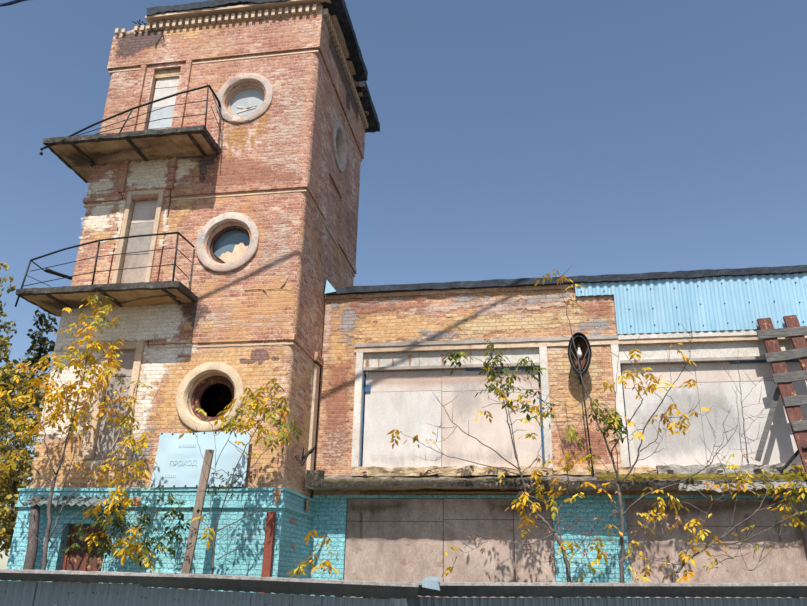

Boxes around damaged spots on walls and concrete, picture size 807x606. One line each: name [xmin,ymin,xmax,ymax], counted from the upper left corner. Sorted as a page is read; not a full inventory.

peeling [79,147,302,255]
damp [179,303,279,331]
peeling [32,303,288,505]
peeling [308,290,616,472]
spalling [351,352,797,477]